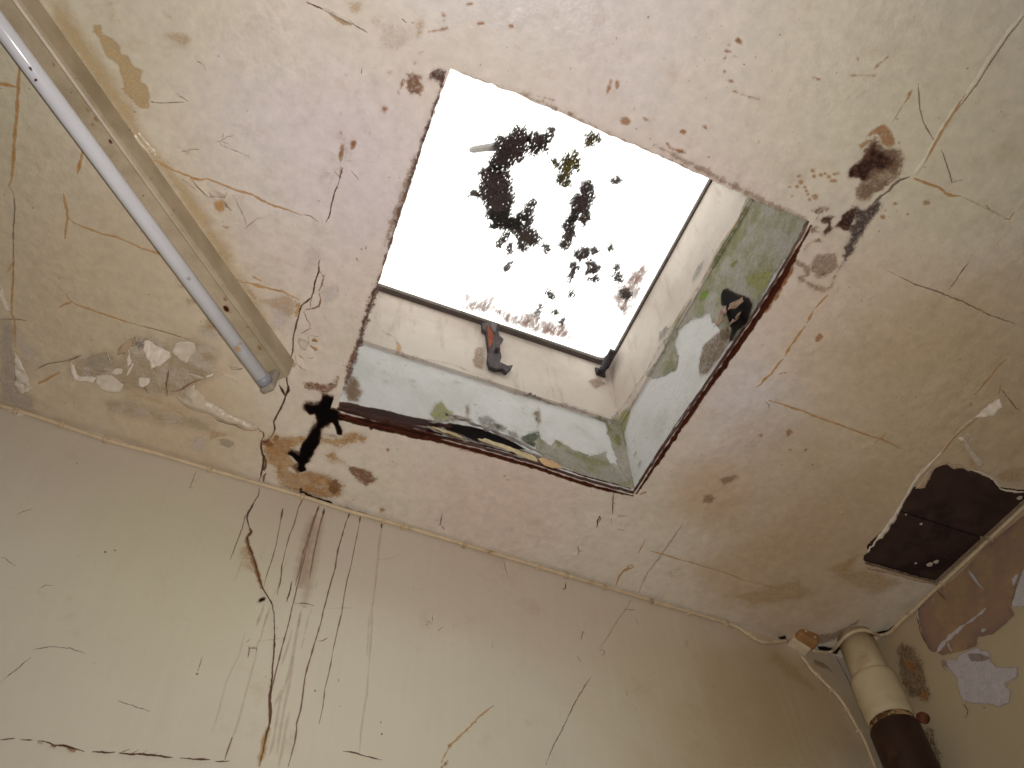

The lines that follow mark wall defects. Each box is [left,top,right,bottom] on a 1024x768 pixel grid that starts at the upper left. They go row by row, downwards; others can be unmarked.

water stain [95,26,149,108]
crack [0,67,26,346]
crack [63,150,160,255]
crack [154,160,343,222]
water stain [811,125,909,261]
crack [905,88,960,197]
peeling [0,323,243,430]
flaking render [428,412,562,469]
crack [231,260,325,766]
water stain [263,376,452,687]
flaking render [917,516,1024,707]
crack [1,738,227,762]